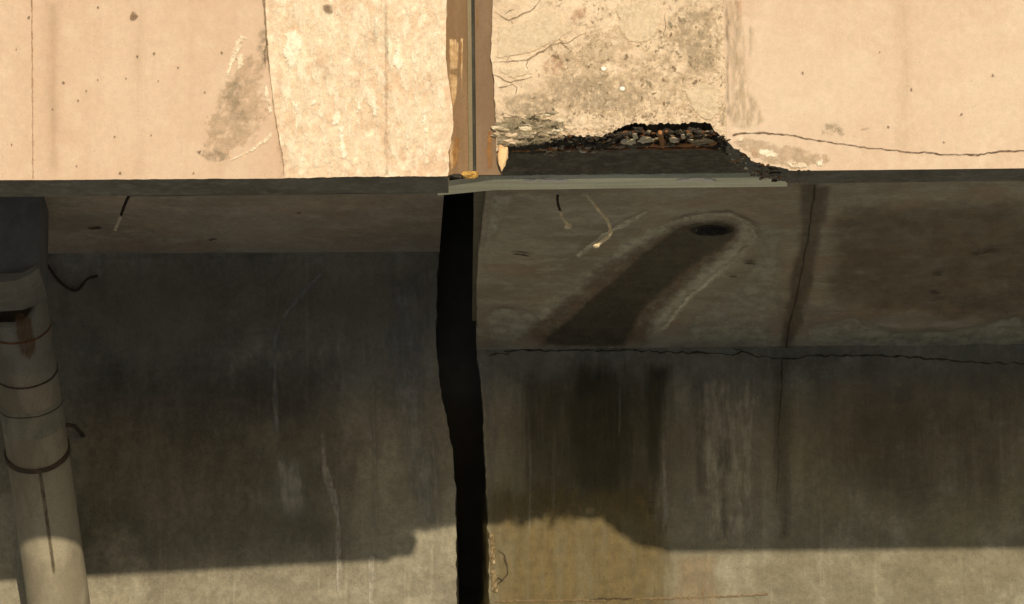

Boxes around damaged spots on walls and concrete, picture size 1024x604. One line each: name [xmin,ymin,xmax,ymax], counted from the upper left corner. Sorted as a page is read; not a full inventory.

crack [496,0,540,24]
crack [492,34,582,92]
spalling [490,0,828,182]
crack [733,132,1024,156]
damp [487,213,778,347]
crack [488,348,1024,365]
damp [490,368,668,604]
damp [691,376,762,549]